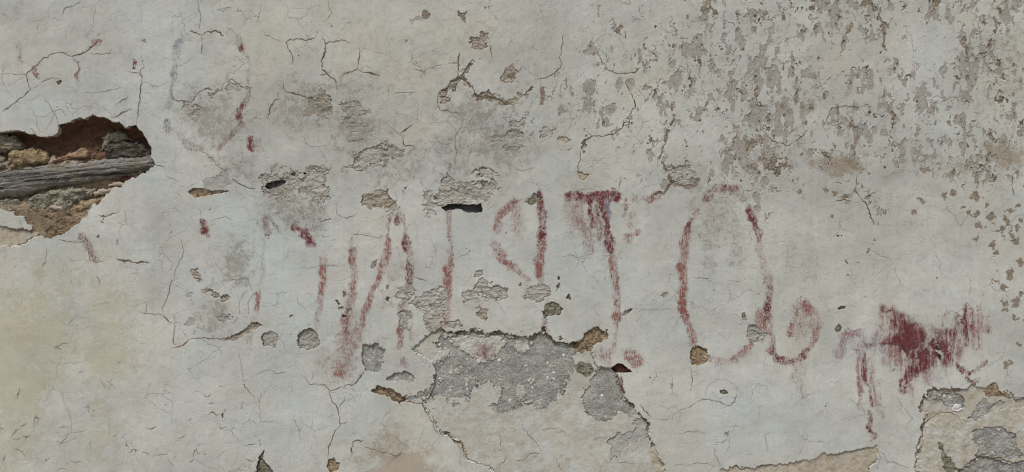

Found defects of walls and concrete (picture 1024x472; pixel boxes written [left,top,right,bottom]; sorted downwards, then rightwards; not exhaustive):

crack [3,40,112,124]
crack [100,56,145,126]
crack [259,3,511,167]
spalling [0,109,152,172]
spalling [0,167,152,249]
spalling [422,166,502,218]
peeling [440,0,1024,321]
crack [42,239,149,305]
crack [144,241,401,461]
flaking render [361,270,666,472]
crack [405,401,564,472]
spalling [914,382,1024,472]